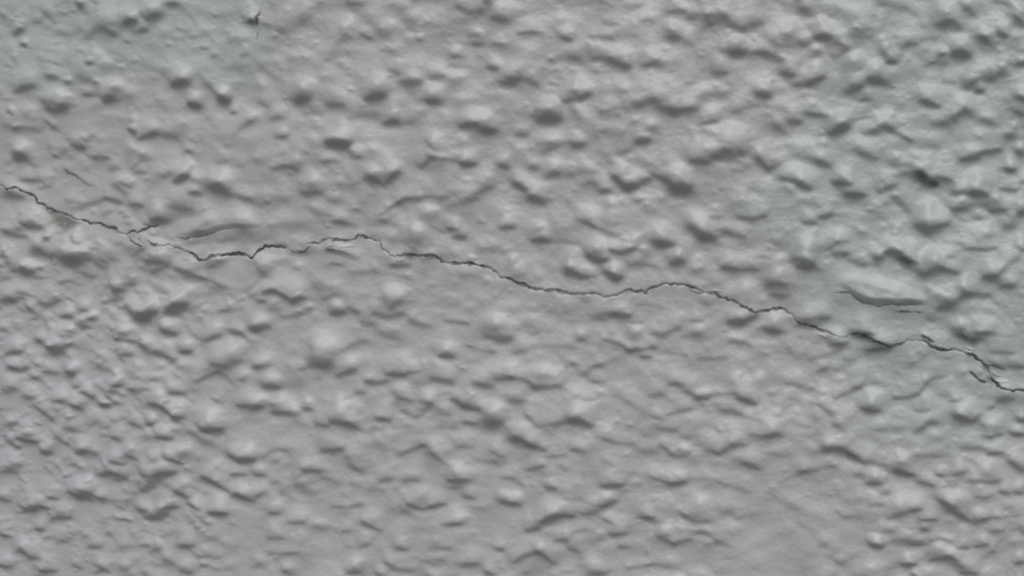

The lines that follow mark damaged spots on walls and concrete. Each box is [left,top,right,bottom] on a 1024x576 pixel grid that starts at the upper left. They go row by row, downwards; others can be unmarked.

crack [5,186,157,247]
crack [189,235,572,294]
crack [616,283,783,313]
crack [863,335,1024,392]